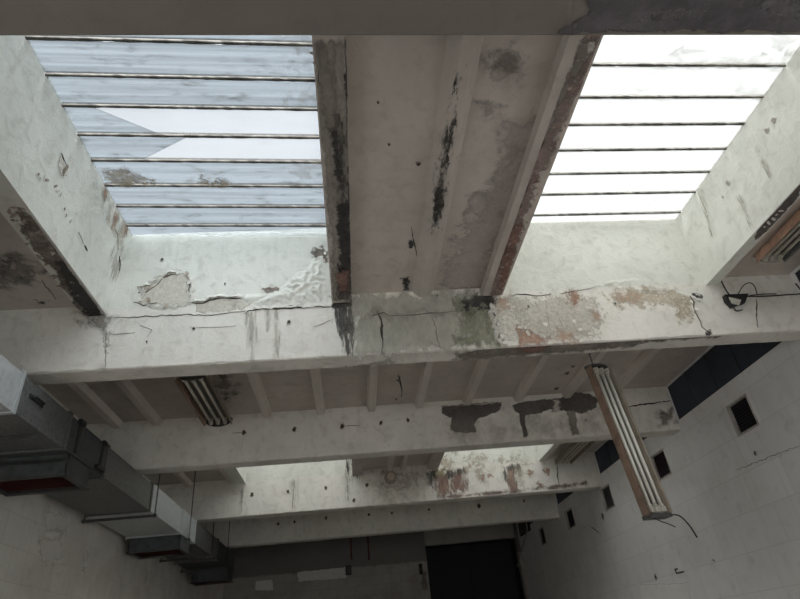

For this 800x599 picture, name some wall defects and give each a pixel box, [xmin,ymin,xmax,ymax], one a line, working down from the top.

peeling [488,0,800,348]
leakage [314,40,720,361]
flaking render [135,268,250,313]
crack [371,310,457,356]
peeling [441,401,502,433]
peeling [513,387,598,437]